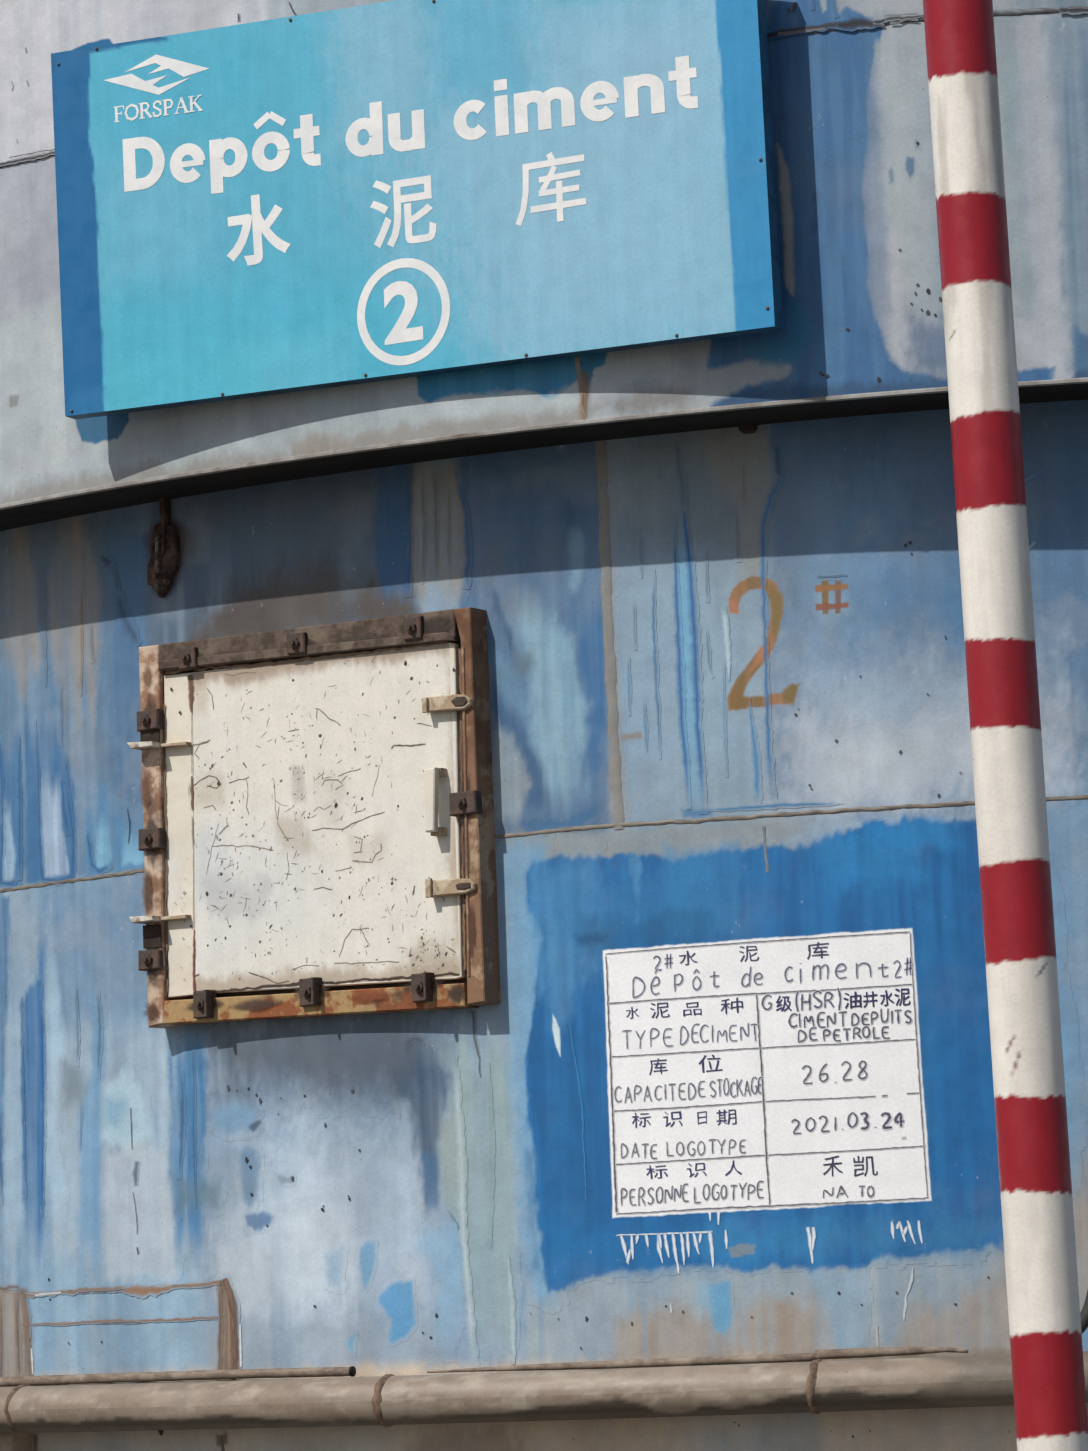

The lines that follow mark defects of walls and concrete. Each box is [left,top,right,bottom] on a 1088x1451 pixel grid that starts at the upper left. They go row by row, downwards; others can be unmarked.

rust [141,514,201,602]
rust [141,617,475,1020]
rust [0,1275,242,1381]